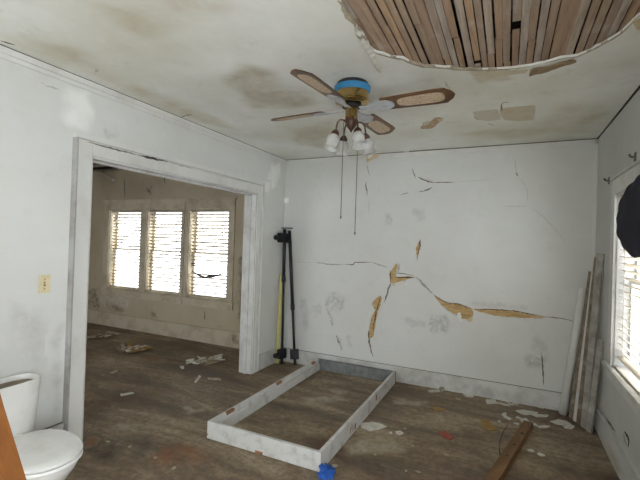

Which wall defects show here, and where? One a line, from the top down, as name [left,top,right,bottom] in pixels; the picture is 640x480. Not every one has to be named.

flaking render [338,0,640,78]
damp [210,53,329,112]
peeling [420,117,443,129]
peeling [473,102,536,126]
crack [89,142,248,183]
crack [401,172,496,195]
crack [305,260,386,268]
flaking render [368,264,415,355]